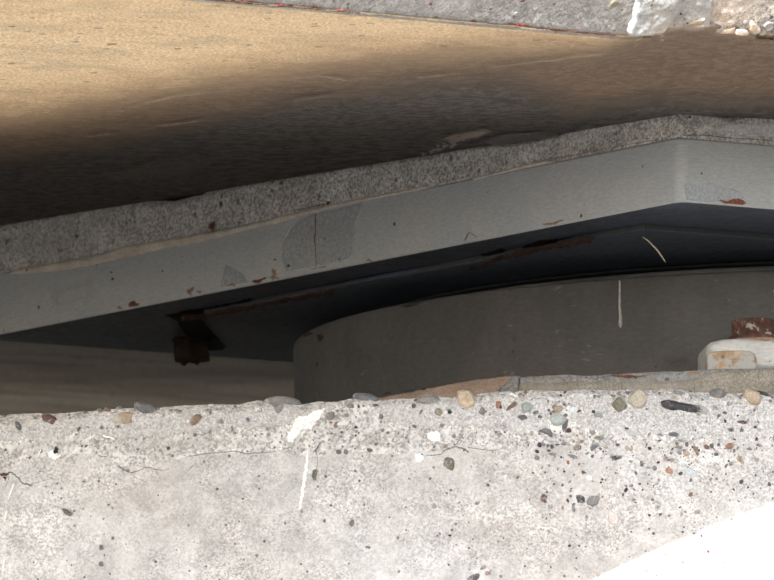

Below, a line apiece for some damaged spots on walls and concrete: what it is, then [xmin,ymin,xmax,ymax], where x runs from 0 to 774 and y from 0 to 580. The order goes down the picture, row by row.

crack [186,451,275,470]
crack [0,472,49,486]